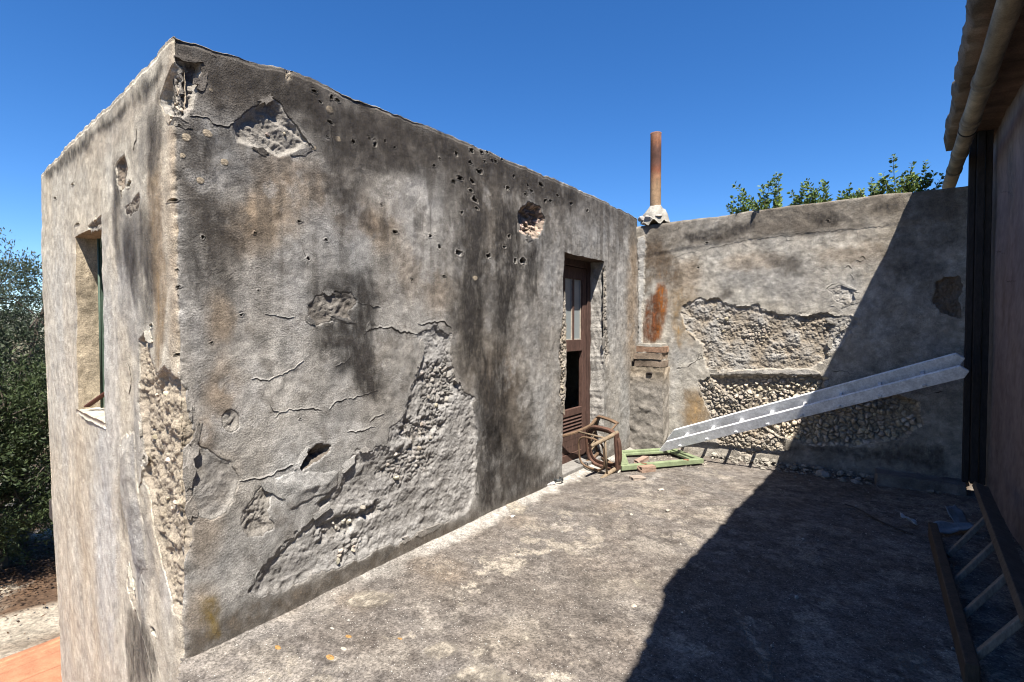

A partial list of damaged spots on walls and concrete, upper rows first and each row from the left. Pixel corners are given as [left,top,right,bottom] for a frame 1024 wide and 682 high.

spalling [161,52,208,130]
spalling [233,93,314,158]
spalling [117,157,140,216]
crack [358,302,452,335]
damp [272,74,577,507]
corrosion [644,284,684,339]
spalling [681,284,867,418]
spalling [138,330,239,616]
crack [240,463,296,482]
crack [252,360,384,433]
spalling [248,325,479,597]
spalling [716,394,924,457]